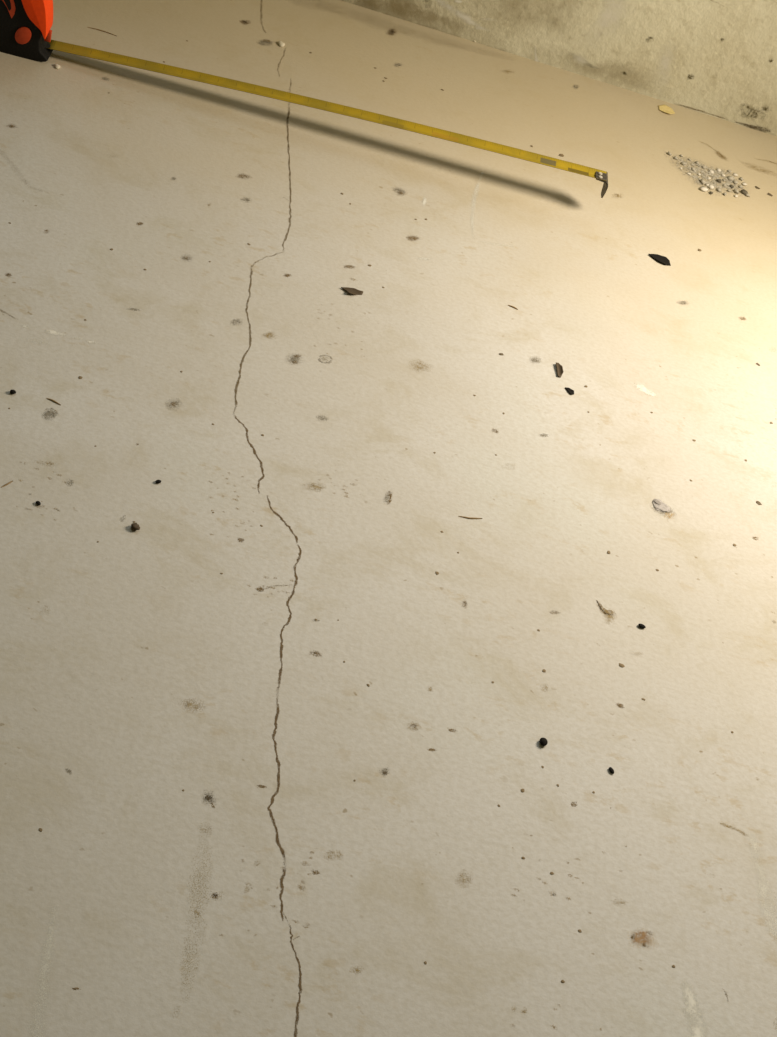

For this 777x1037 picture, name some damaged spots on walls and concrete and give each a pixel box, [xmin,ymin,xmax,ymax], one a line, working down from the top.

crack [234,50,302,1037]